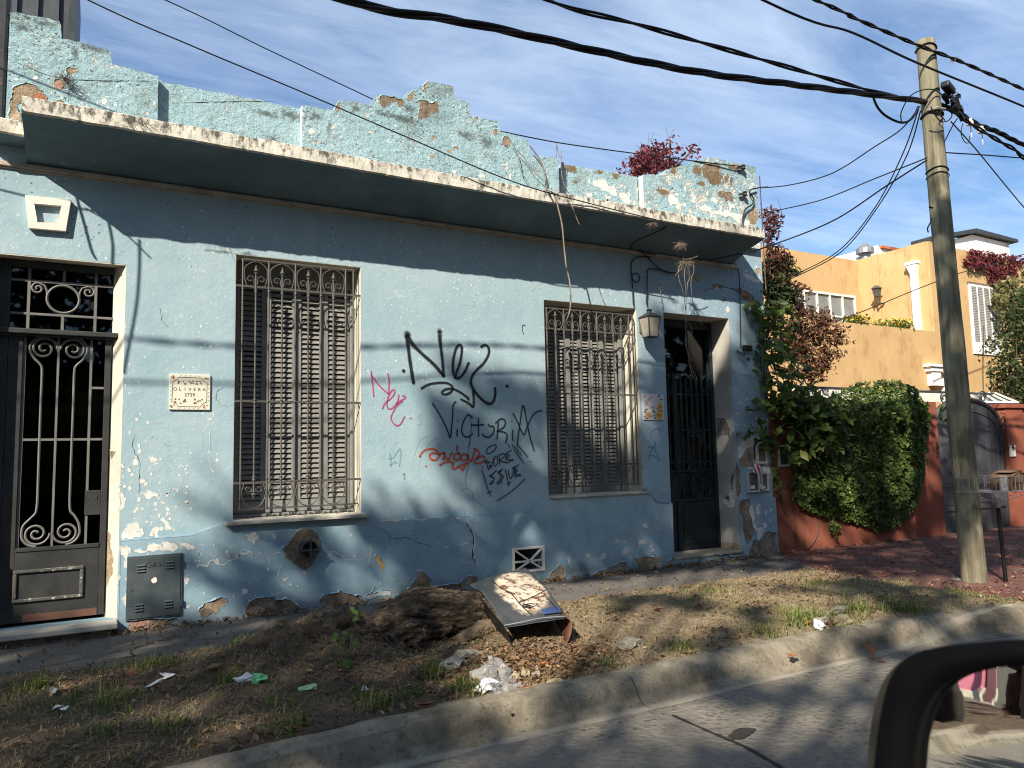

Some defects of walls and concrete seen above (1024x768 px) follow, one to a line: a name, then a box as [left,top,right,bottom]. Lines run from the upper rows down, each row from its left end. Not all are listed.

spalling [7,66,79,120]
spalling [379,80,439,121]
spalling [492,128,511,149]
peeling [586,178,635,205]
peeling [662,162,759,227]
spalling [105,412,311,618]
spalling [319,518,429,606]
crack [319,395,495,575]
spalling [407,558,478,590]
peeling [585,509,667,577]
spalling [716,395,777,558]